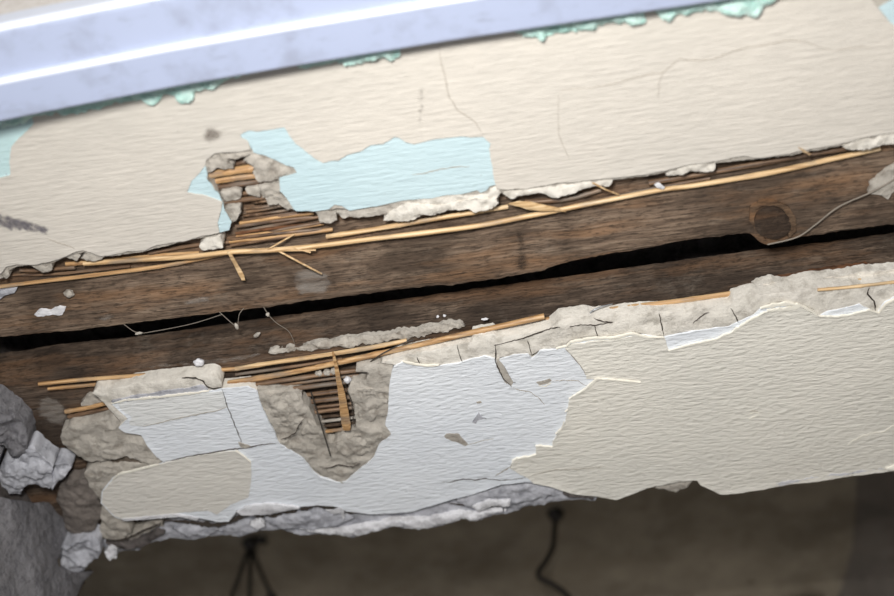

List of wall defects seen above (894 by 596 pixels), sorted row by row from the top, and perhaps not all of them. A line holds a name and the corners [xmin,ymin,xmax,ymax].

peeling [878,0,894,24]
crack [558,40,866,158]
peeling [188,127,495,232]
peeling [56,271,894,553]
flaking render [838,465,894,596]